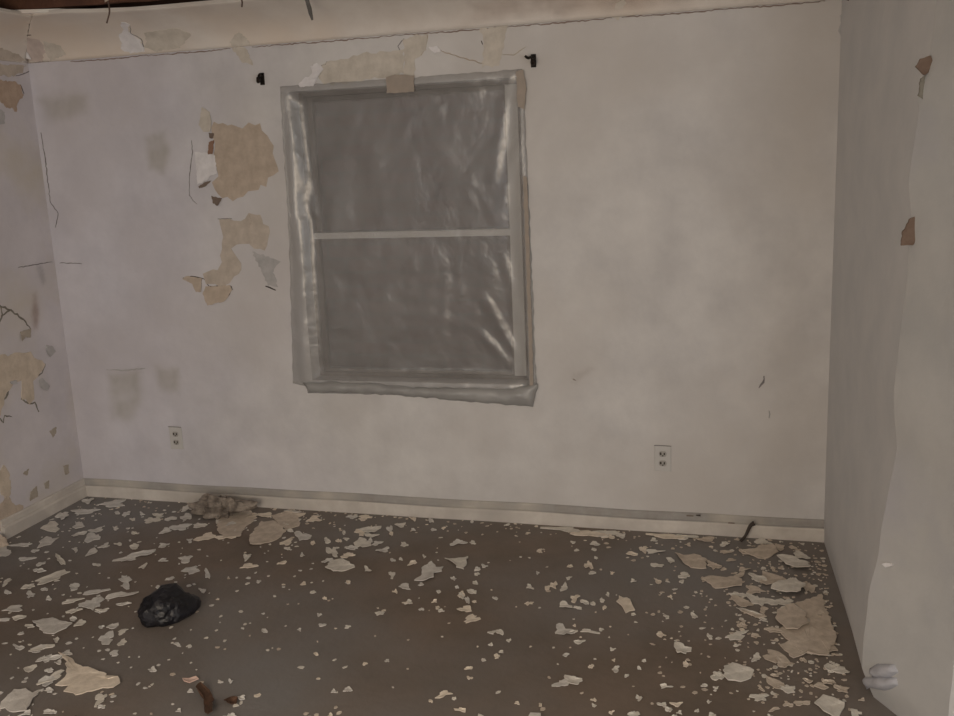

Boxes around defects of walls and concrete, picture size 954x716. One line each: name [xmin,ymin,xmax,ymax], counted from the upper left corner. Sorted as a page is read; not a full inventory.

peeling [0,35,66,125]
peeling [299,49,404,87]
spalling [915,56,932,99]
peeling [195,107,279,206]
peeling [183,213,281,306]
peeling [900,217,915,246]
crack [0,305,31,341]
peeling [0,345,56,423]
peeling [0,465,49,531]